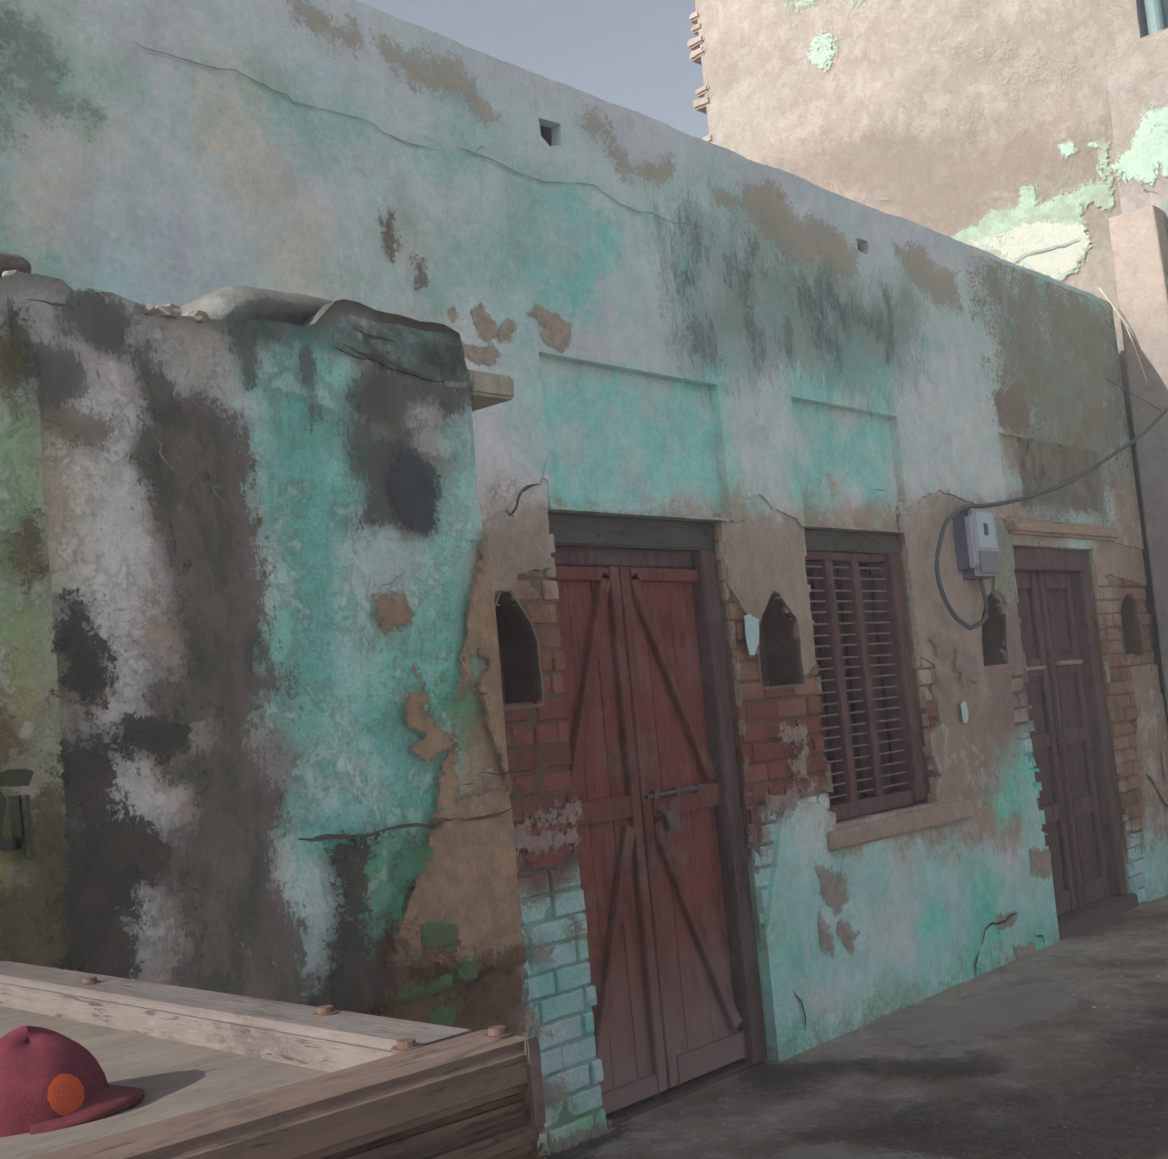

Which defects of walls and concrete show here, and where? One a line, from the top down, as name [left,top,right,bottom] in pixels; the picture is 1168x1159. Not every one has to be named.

crack [132,40,721,238]
peeling [447,302,517,366]
peeling [527,304,572,354]
flaking render [890,238,1161,904]
water stain [0,286,534,1036]
flaking render [713,495,830,943]
crack [298,806,517,842]
flaking render [385,478,616,1157]
flaking render [814,862,859,961]
crack [974,913,1017,977]
water stain [509,1122,631,1159]
water stain [734,1005,1168,1159]